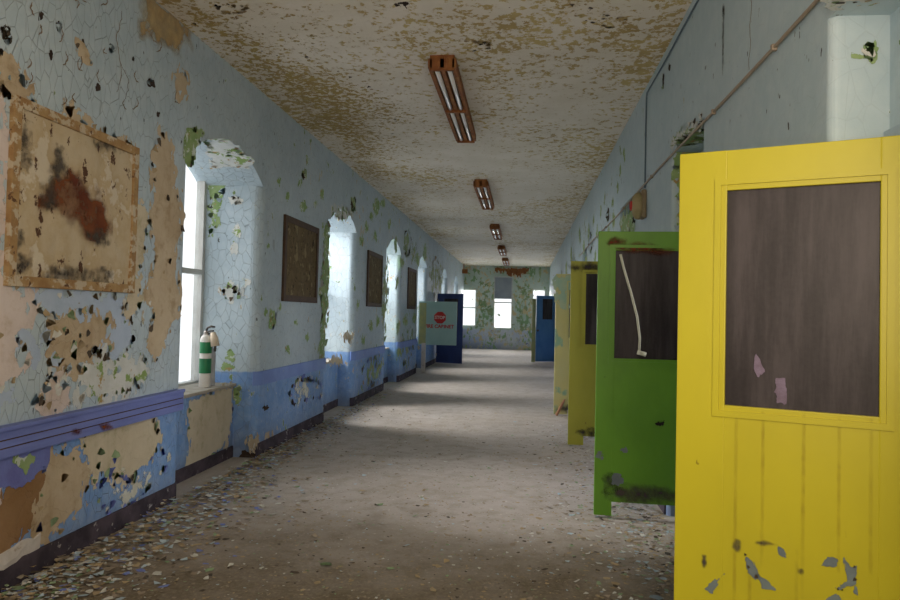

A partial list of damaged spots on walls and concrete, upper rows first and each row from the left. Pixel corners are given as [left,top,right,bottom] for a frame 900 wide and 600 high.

peeling [161,0,431,247]
flaking render [0,24,255,416]
flaking render [185,349,242,466]
peeling [264,303,281,330]
peeling [288,374,323,406]
peeling [300,190,356,368]
peeling [341,218,445,390]